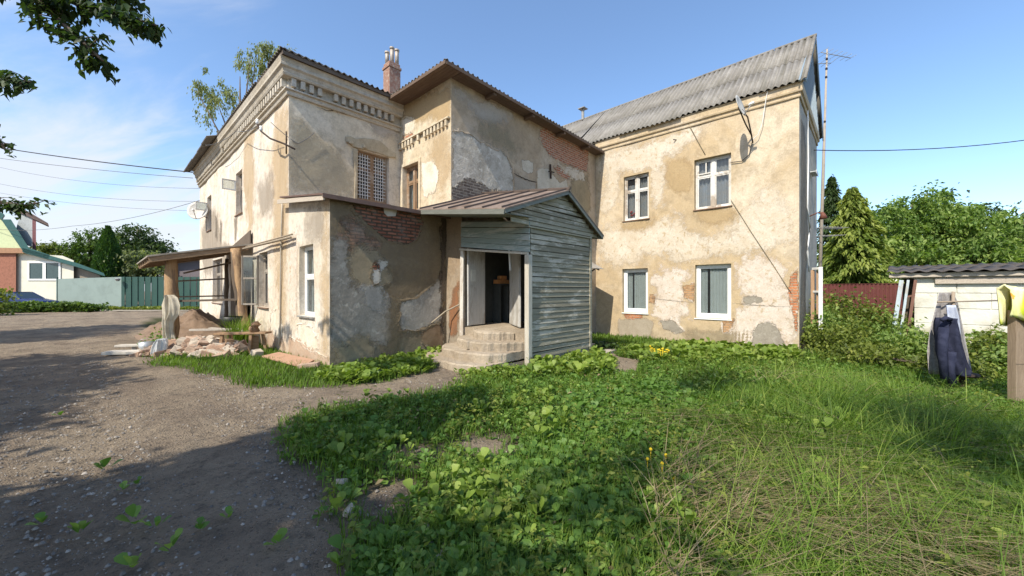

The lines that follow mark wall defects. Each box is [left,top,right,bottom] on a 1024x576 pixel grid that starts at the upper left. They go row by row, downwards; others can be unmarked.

flaking render [451,128,515,200]
flaking render [536,127,589,189]
flaking render [266,203,446,366]
flaking render [681,282,695,303]
flaking render [787,270,799,335]